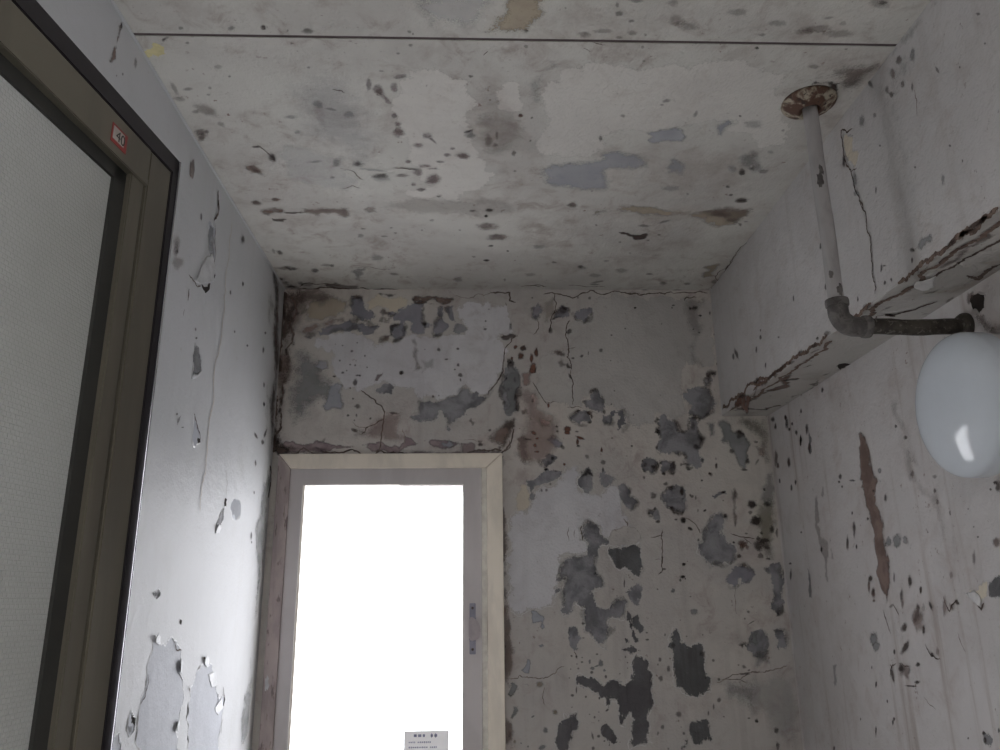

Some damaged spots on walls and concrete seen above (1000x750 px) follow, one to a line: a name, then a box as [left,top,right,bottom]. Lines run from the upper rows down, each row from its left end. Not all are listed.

crack [841,129,876,290]
rust [898,207,998,284]
leakage [254,273,368,454]
peeling [307,294,468,343]
crack [456,285,705,408]
rust [722,332,829,413]
peeling [641,371,785,616]
rust [859,433,890,602]
peeling [554,520,645,656]
peeling [113,633,225,750]
peeling [555,711,581,750]
peeling [571,626,712,750]